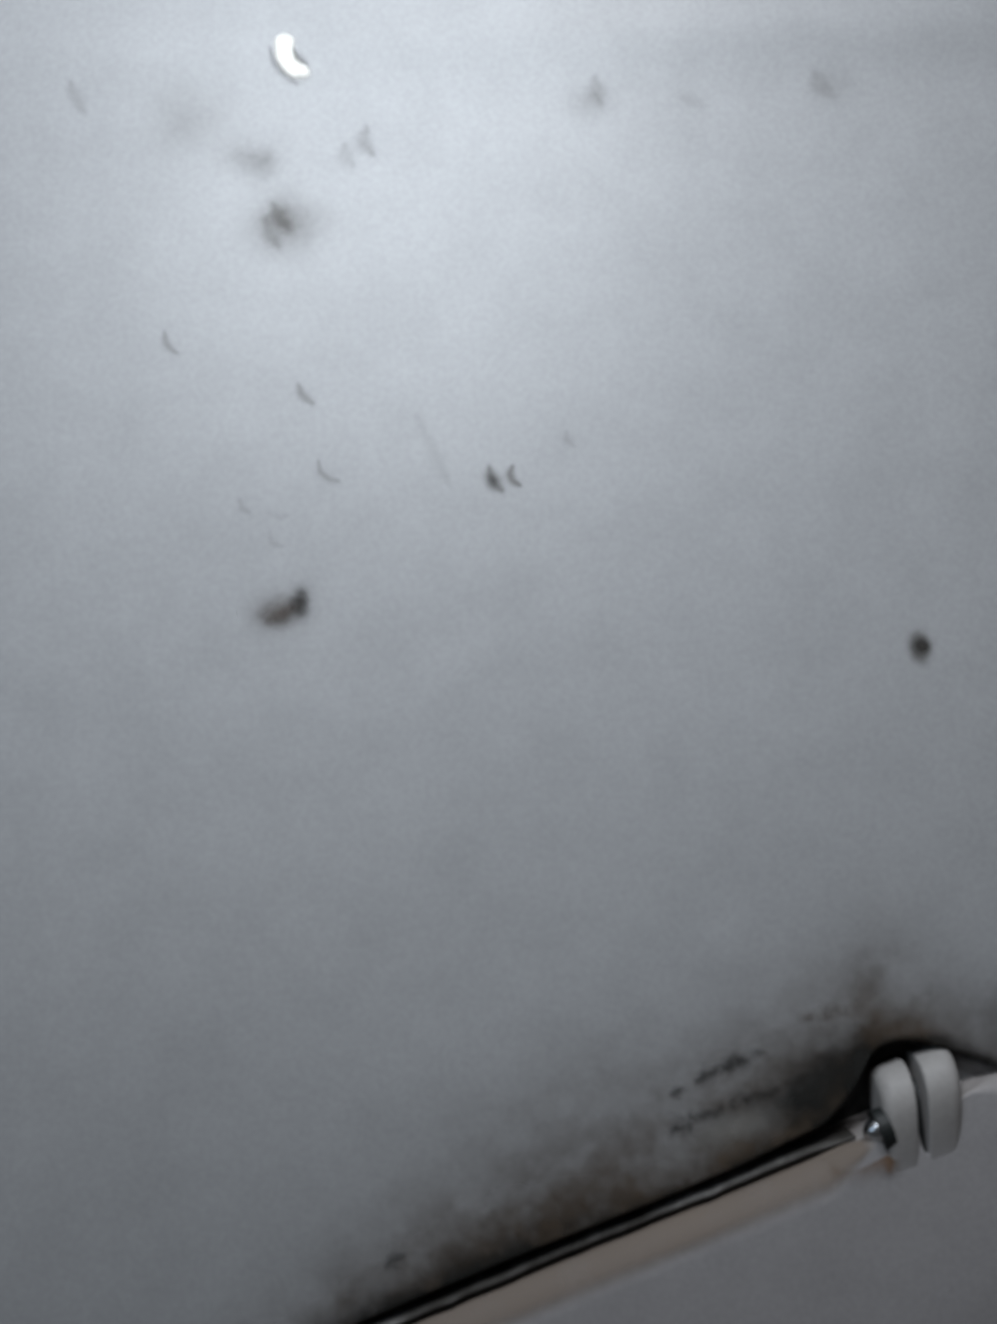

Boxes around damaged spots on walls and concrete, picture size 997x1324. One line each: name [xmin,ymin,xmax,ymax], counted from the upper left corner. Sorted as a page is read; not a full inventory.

leakage [270,592,305,620]
leakage [914,638,928,654]